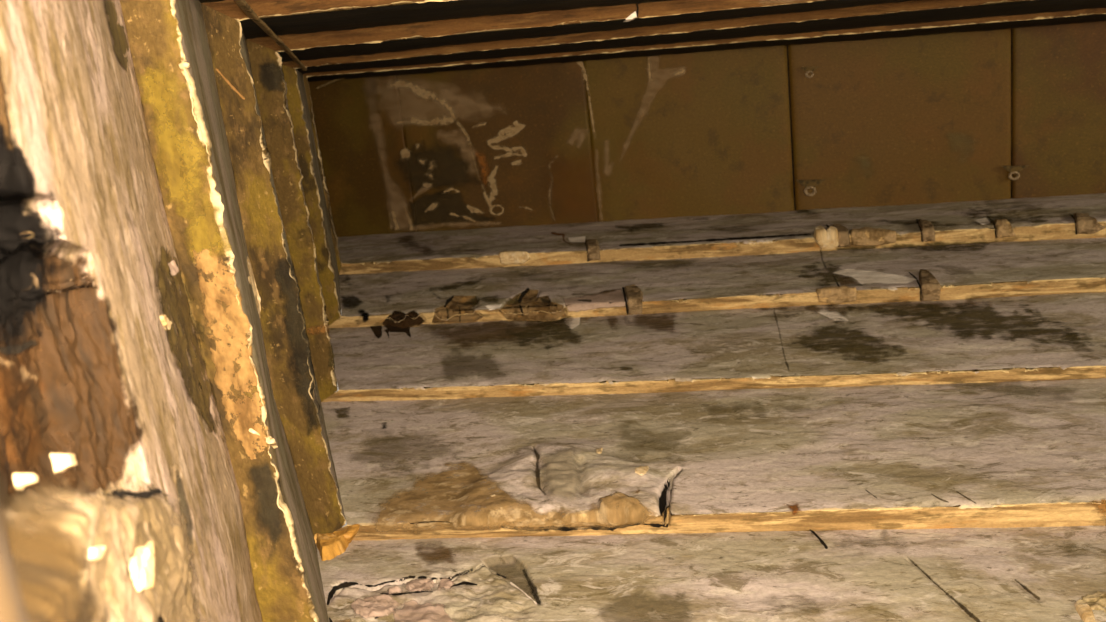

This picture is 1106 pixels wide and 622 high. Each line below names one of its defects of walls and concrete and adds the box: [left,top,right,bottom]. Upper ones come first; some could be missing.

damp [367,79,527,253]
damp [806,298,976,315]
spalling [0,201,143,501]
crack [111,488,163,498]
spalling [374,462,622,535]
peeling [335,578,454,622]
crack [327,564,483,622]
spalling [484,556,541,604]
crack [912,561,981,622]